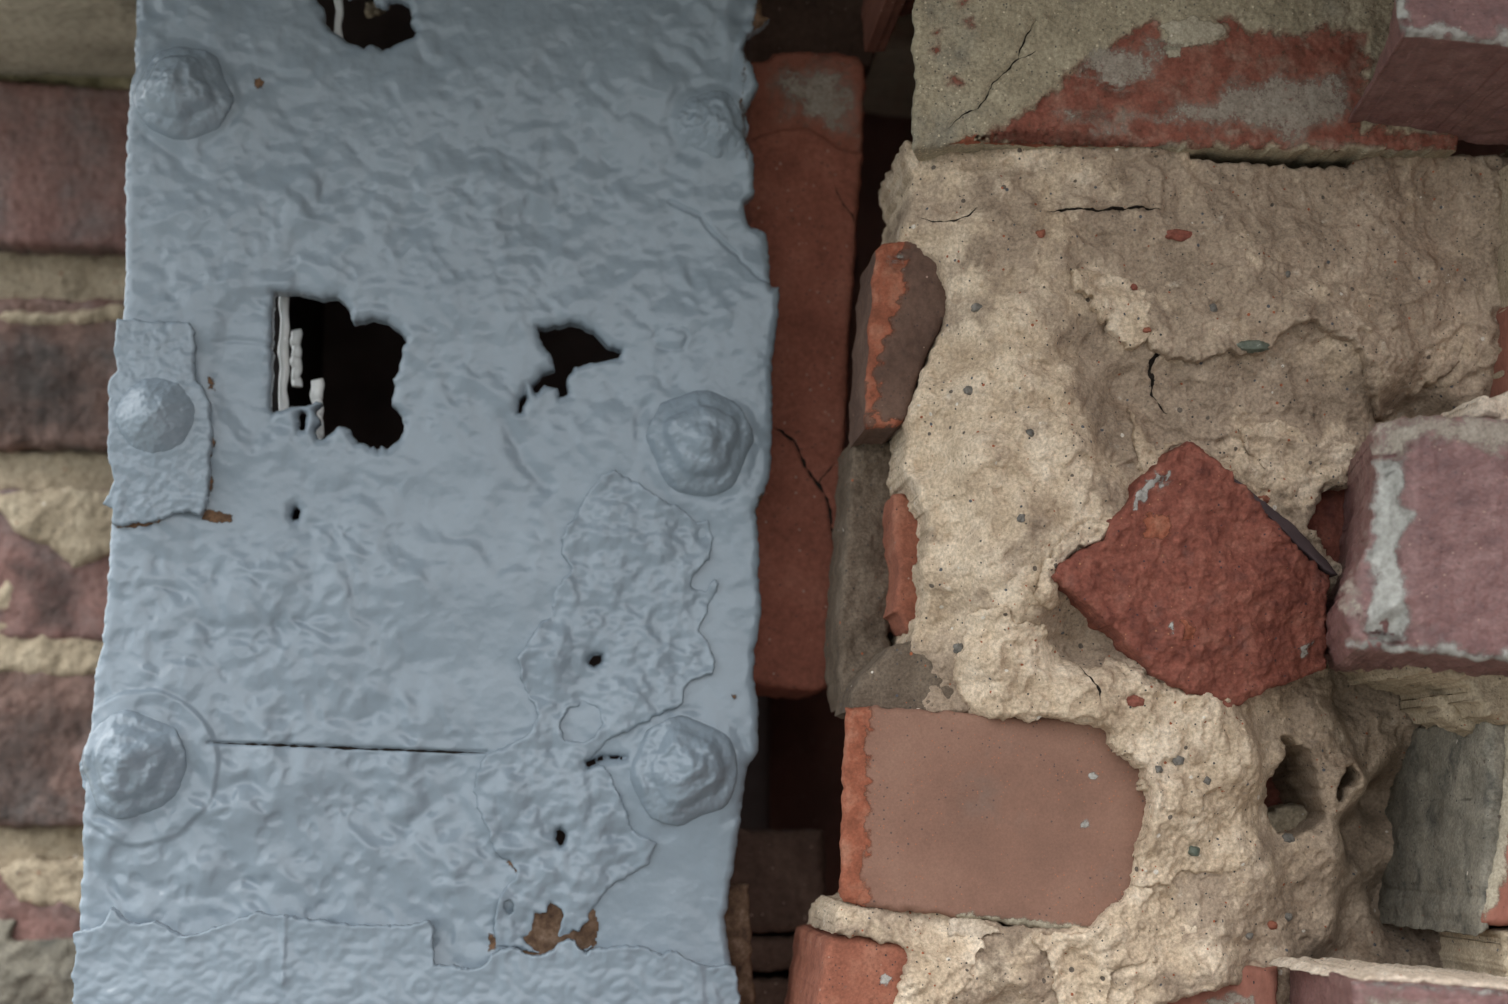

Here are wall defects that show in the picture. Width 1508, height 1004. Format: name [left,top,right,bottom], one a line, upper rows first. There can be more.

crack [949,22,1036,128]
spalling [950,16,1458,151]
crack [1051,204,1159,212]
crack [1148,353,1167,414]
crack [773,427,833,532]
rust [523,903,599,955]